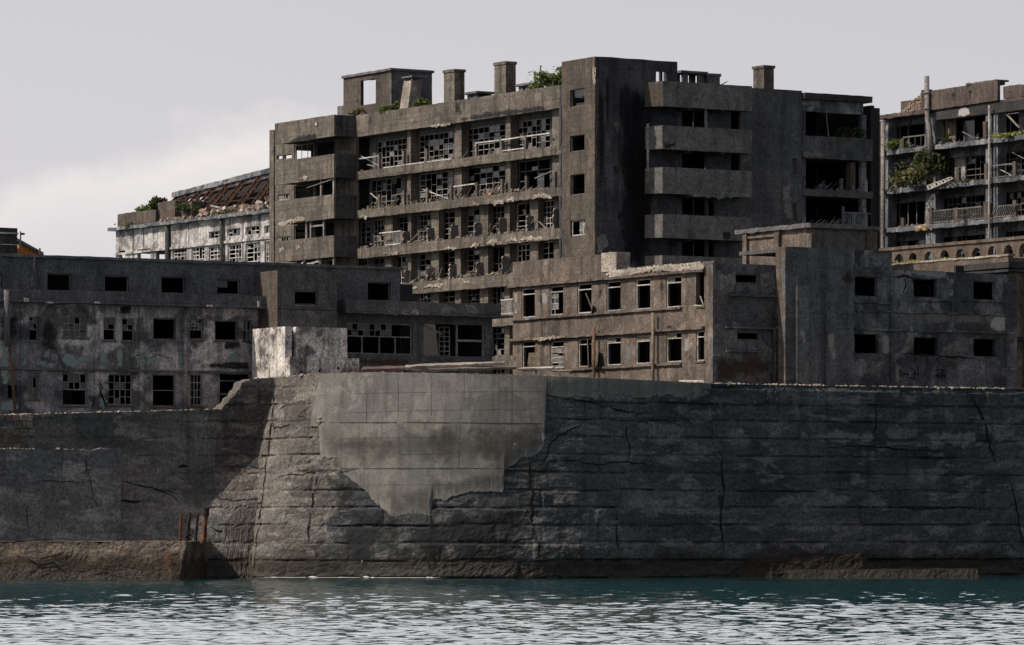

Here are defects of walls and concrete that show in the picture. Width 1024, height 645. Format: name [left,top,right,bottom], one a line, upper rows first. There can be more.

water stain [41,323,56,363]
crack [971,395,997,463]
crack [37,453,181,507]
crack [504,395,652,570]
crack [713,457,730,549]